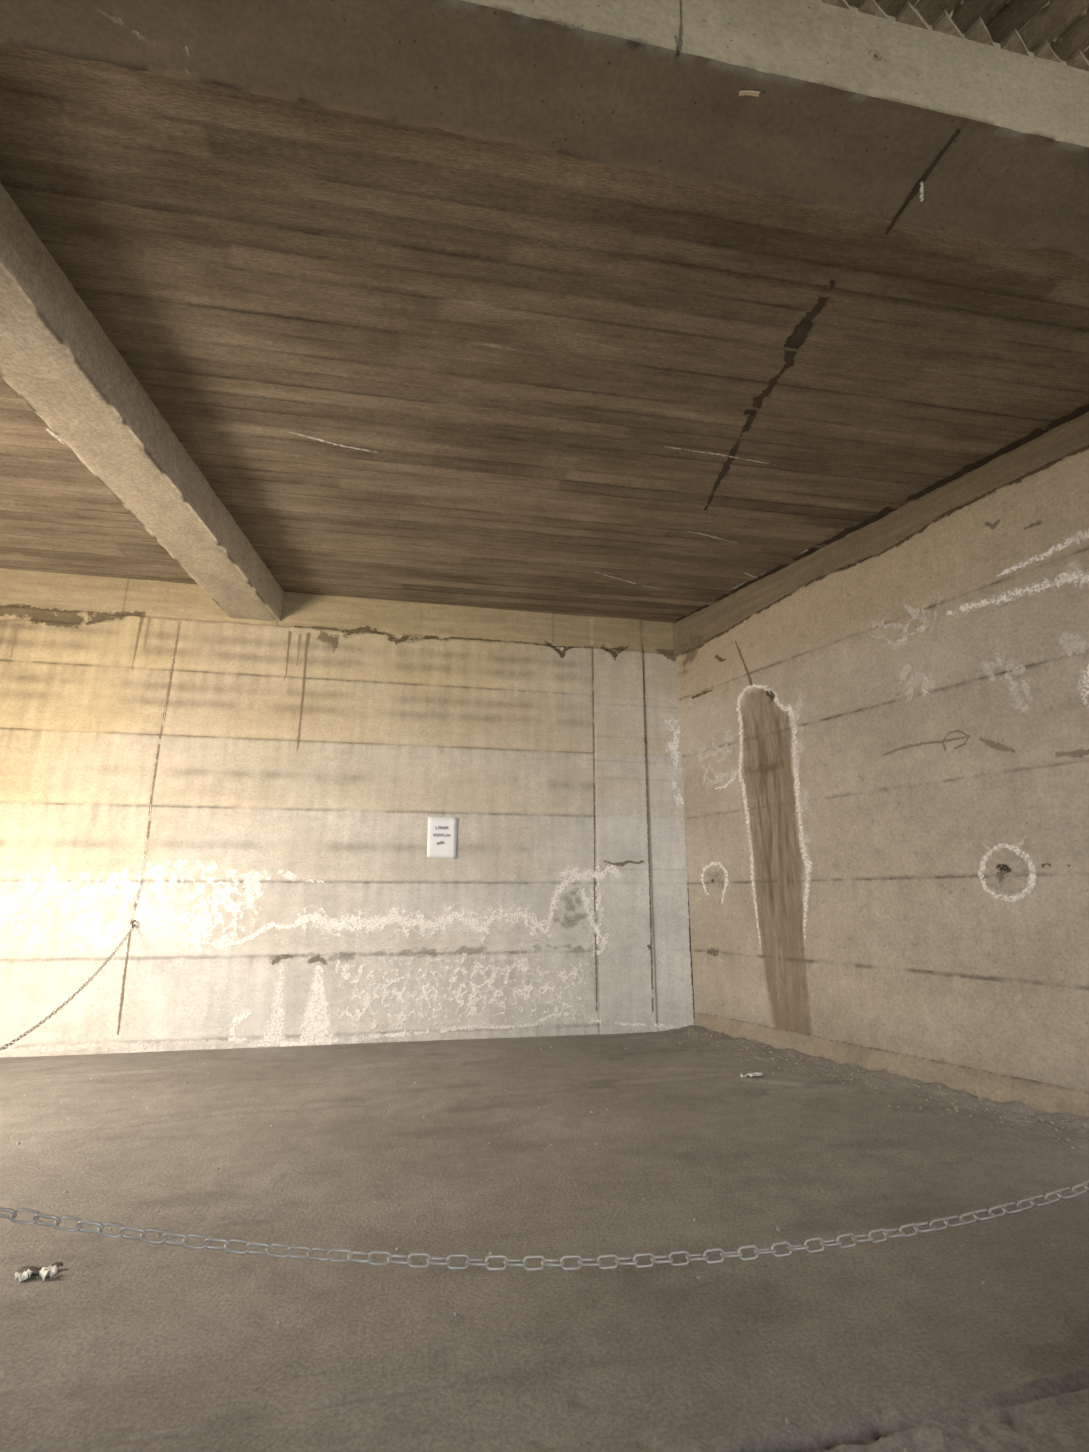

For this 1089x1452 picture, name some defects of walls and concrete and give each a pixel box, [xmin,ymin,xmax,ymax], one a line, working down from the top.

crack [885,129,961,234]
crack [704,281,835,510]
water stain [0,604,150,667]
water stain [871,529,1089,708]
water stain [982,655,1033,712]
water stain [664,684,813,1035]
water stain [0,858,687,1054]